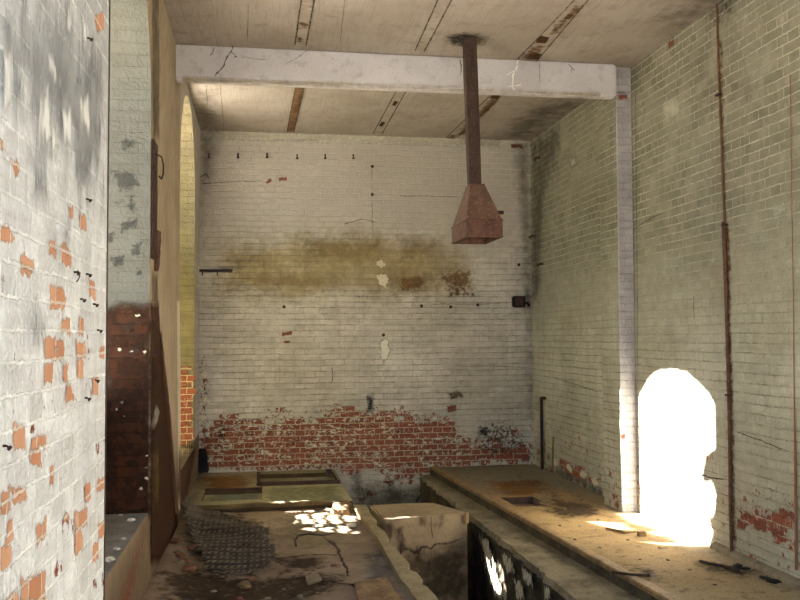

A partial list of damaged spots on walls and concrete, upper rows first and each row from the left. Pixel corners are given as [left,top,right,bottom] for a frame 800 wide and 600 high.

crack [206,28,267,126]
peeling [38,88,71,149]
peeling [80,96,90,135]
peeling [1,225,15,243]
peeling [20,253,35,278]
peeling [49,240,72,269]
rust [442,270,474,297]
leakage [523,131,558,295]
peeling [177,299,533,509]
peeling [737,493,795,550]
crack [278,539,355,587]
spalling [467,524,555,600]